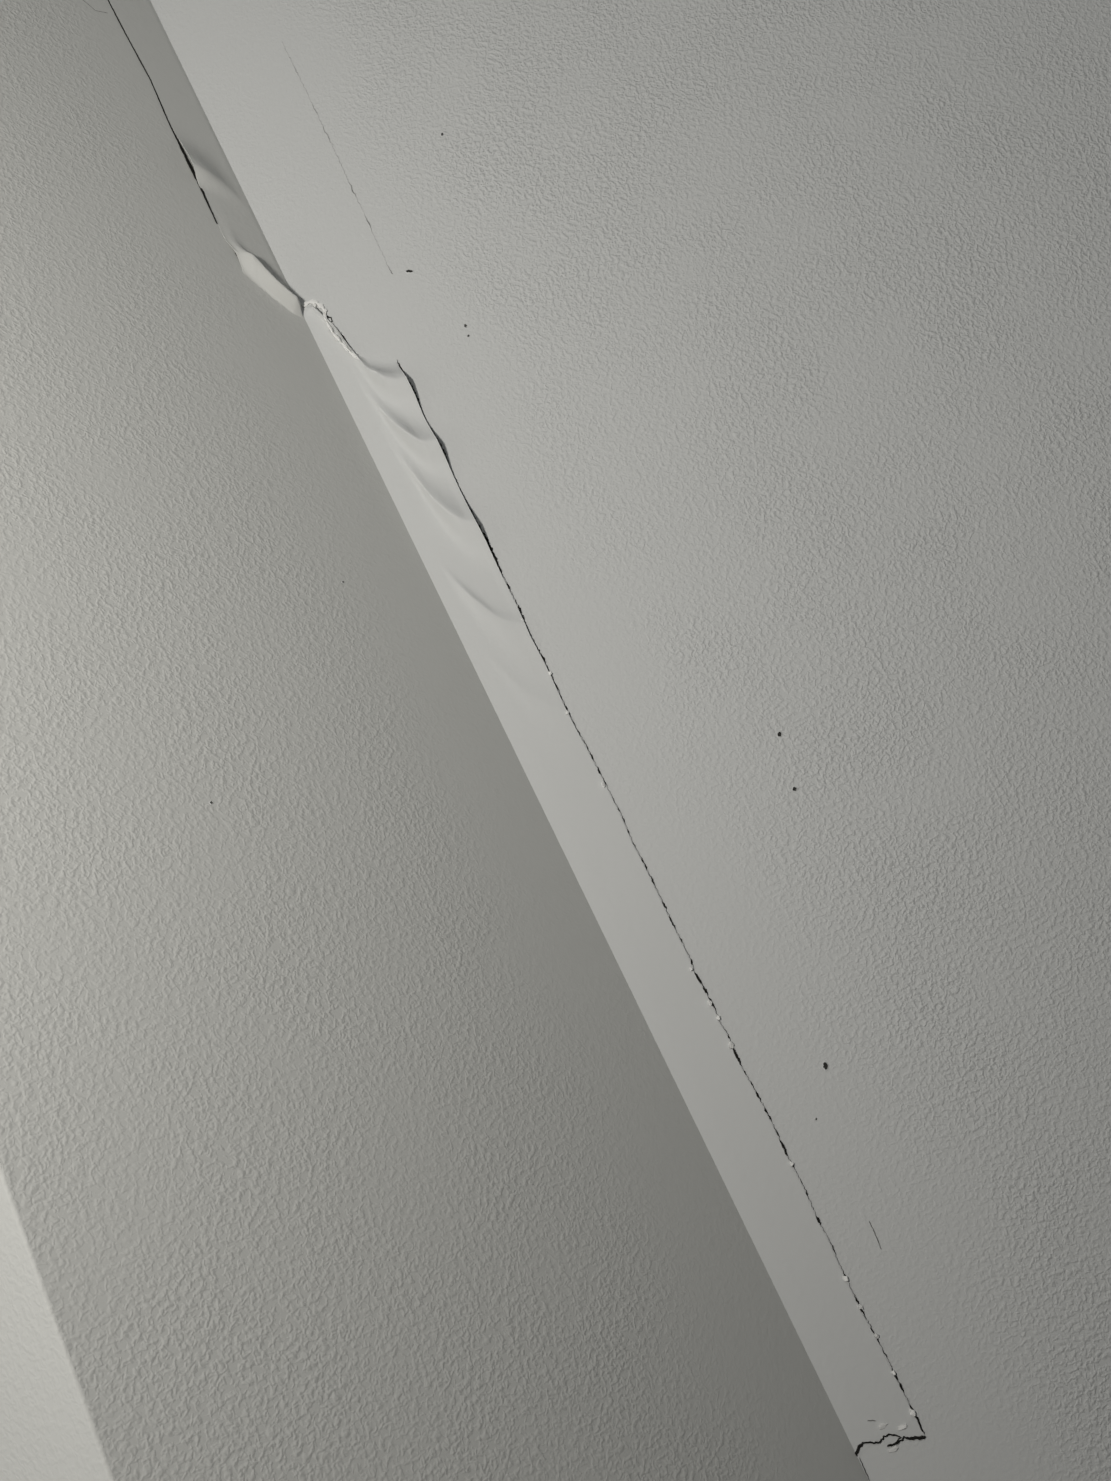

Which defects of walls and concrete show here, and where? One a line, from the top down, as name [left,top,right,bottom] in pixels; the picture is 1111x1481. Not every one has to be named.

crack [83,0,237,256]
crack [397,360,926,1481]